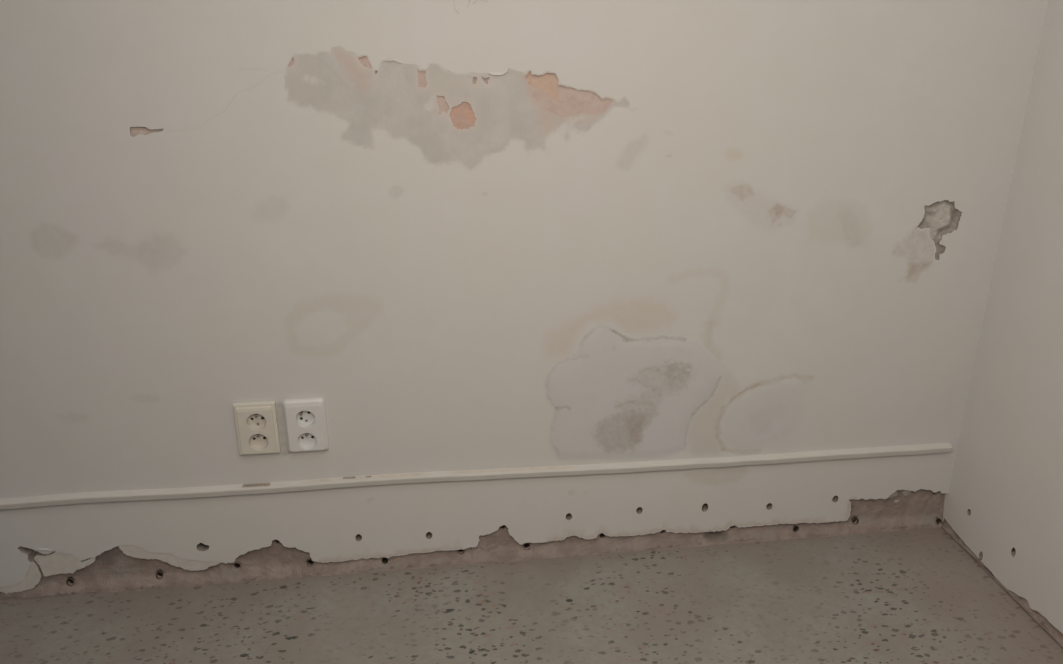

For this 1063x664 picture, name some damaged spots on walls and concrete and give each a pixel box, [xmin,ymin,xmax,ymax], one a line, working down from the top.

spalling [131,127,163,137]
peeling [280,45,644,175]
spalling [886,200,961,286]
spalling [0,489,1063,649]